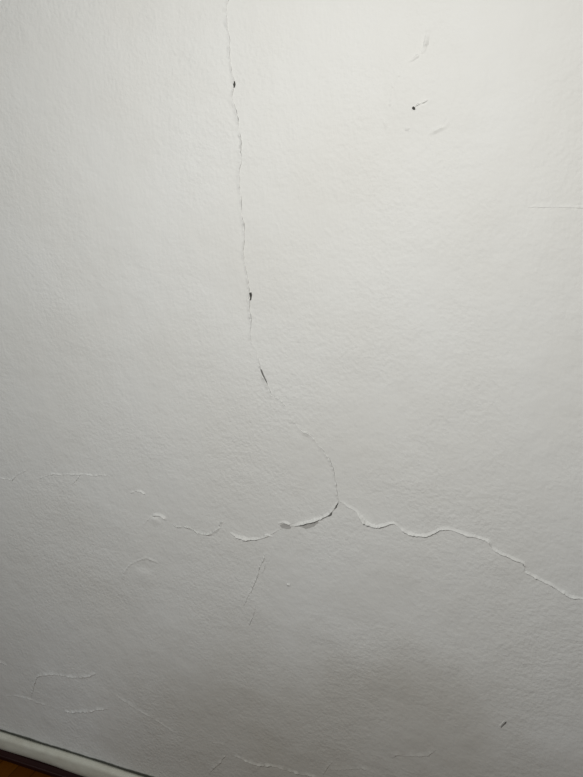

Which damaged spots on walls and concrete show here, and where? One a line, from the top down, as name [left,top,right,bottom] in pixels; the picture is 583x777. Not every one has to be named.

crack [172,0,583,600]